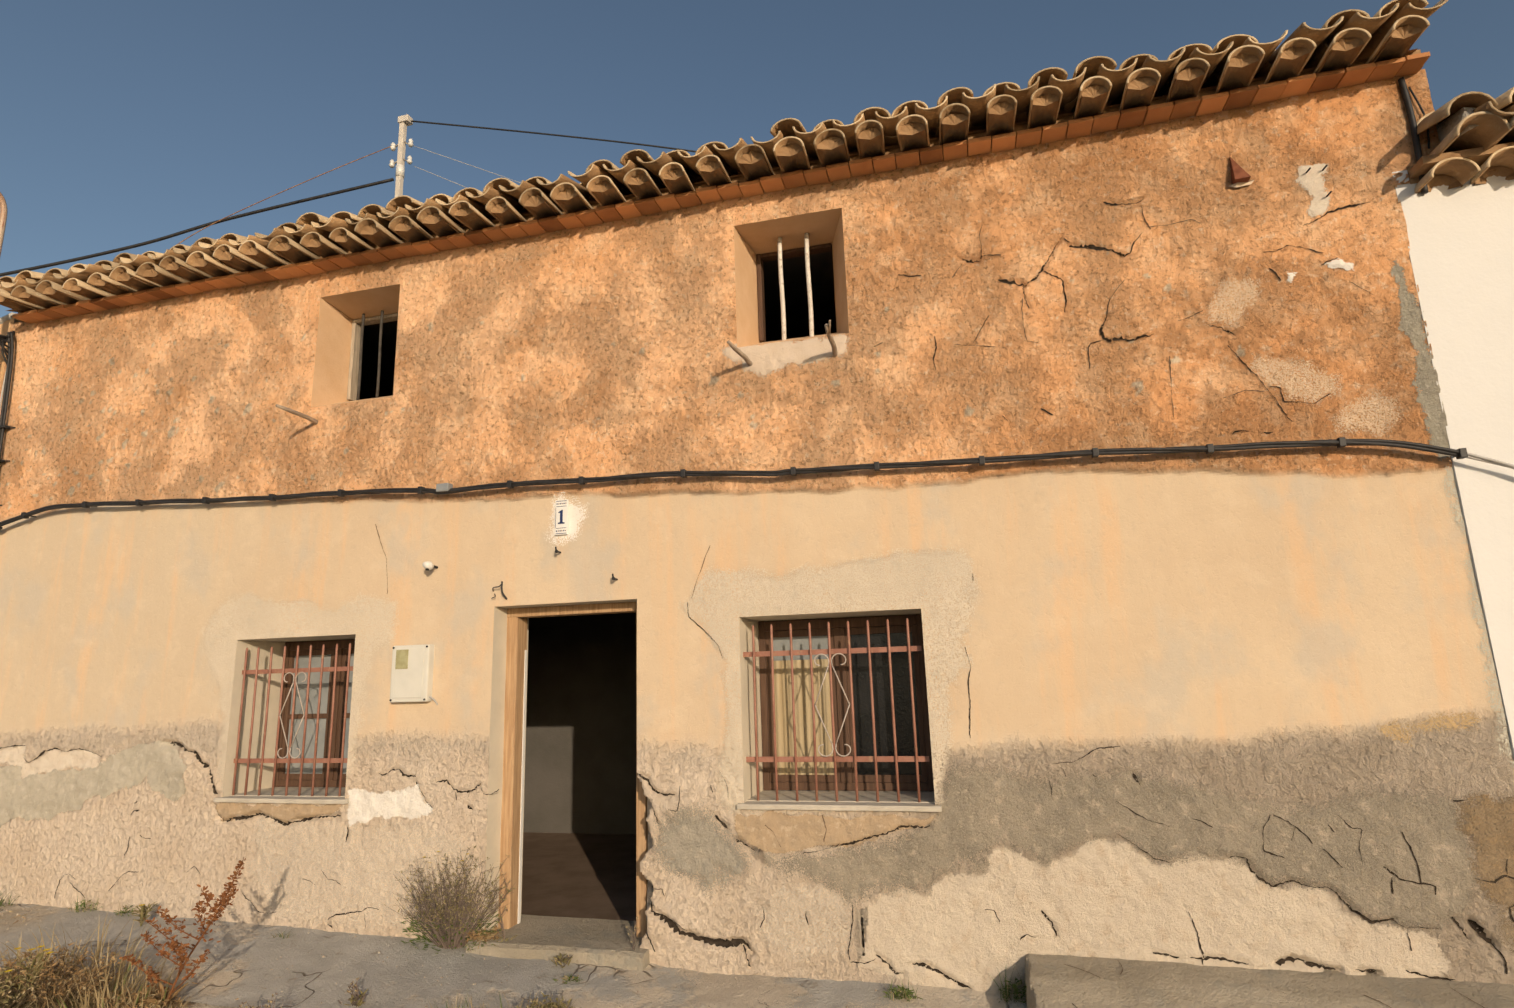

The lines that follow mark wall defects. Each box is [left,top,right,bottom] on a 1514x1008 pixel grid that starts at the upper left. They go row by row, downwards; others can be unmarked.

crack [1268,202,1373,295]
crack [898,200,1331,434]
flaking render [0,744,102,779]
flaking render [213,802,485,934]
flaking render [734,810,935,855]
flaking render [755,836,1452,994]
crack [985,746,1514,1008]